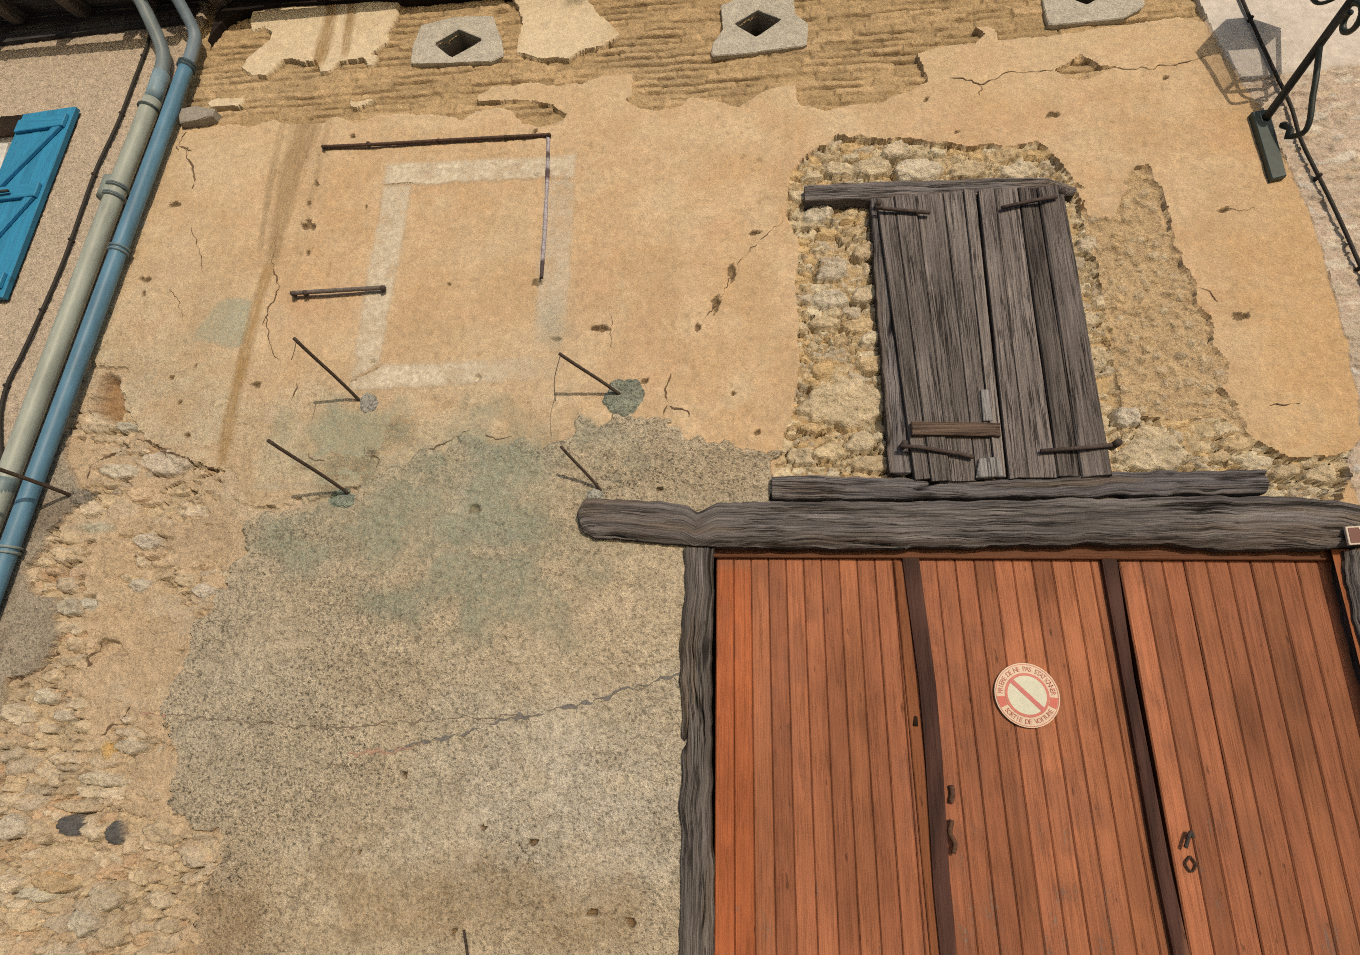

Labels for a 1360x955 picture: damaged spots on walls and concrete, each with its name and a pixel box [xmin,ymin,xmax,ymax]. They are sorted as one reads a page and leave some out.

flaking render [187,0,1208,138]
crack [956,70,1052,95]
crack [262,240,298,400]
crack [700,221,783,326]
flaking render [775,129,1353,501]
flaking render [0,357,361,955]
crack [101,672,680,757]